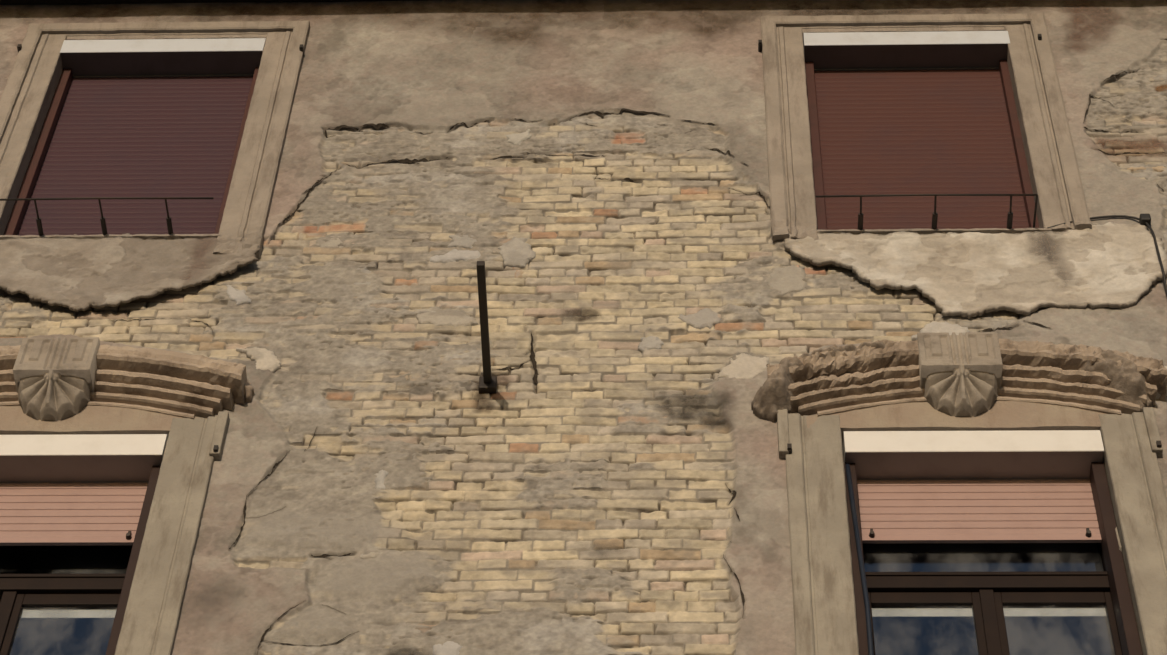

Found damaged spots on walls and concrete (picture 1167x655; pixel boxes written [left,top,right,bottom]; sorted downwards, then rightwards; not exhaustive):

crack [270,108,770,241]
peeling [783,40,1167,319]
flaking render [0,108,1026,655]
crack [493,333,539,392]
crack [229,427,317,549]
crack [257,601,356,654]